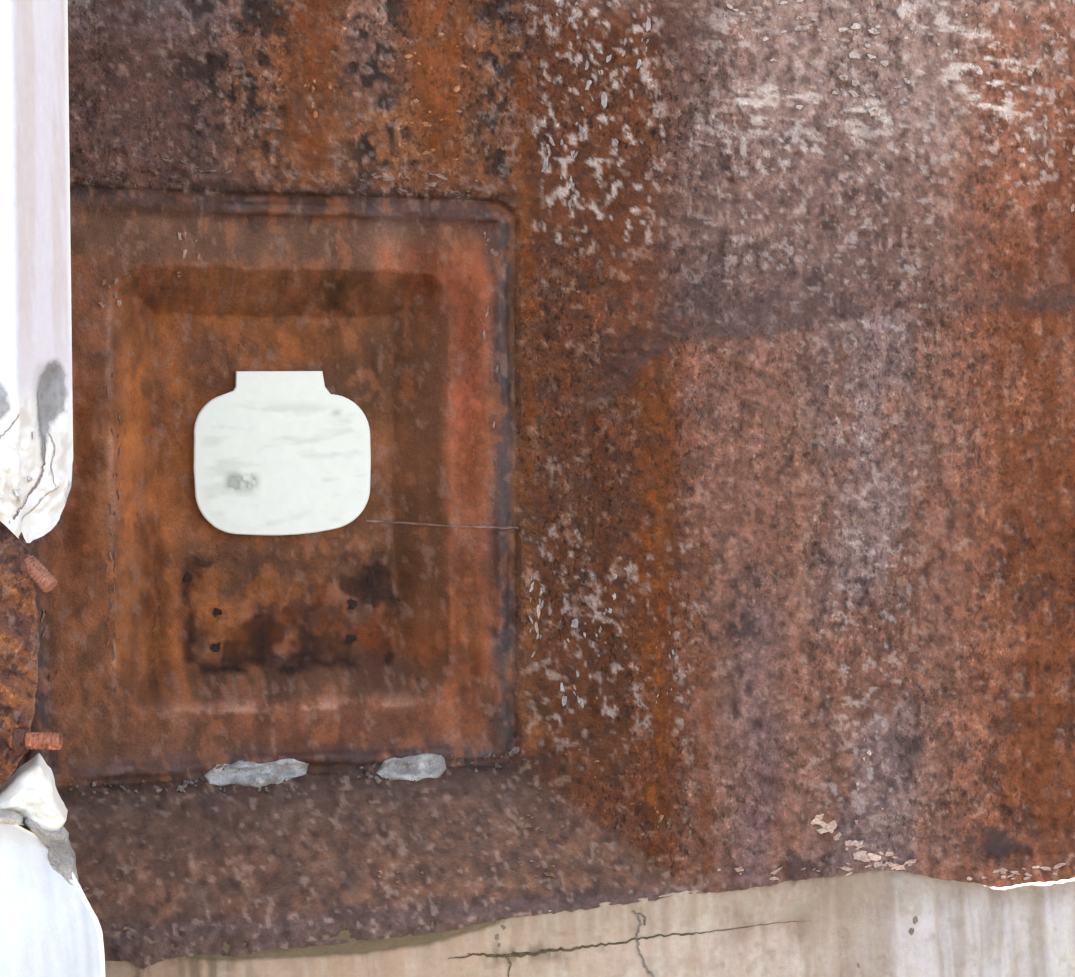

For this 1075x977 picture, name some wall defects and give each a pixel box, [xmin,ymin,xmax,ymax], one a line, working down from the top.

spalling [0,362,66,523]
corrosion [341,563,394,610]
corrosion [186,605,392,673]
crack [448,910,812,977]